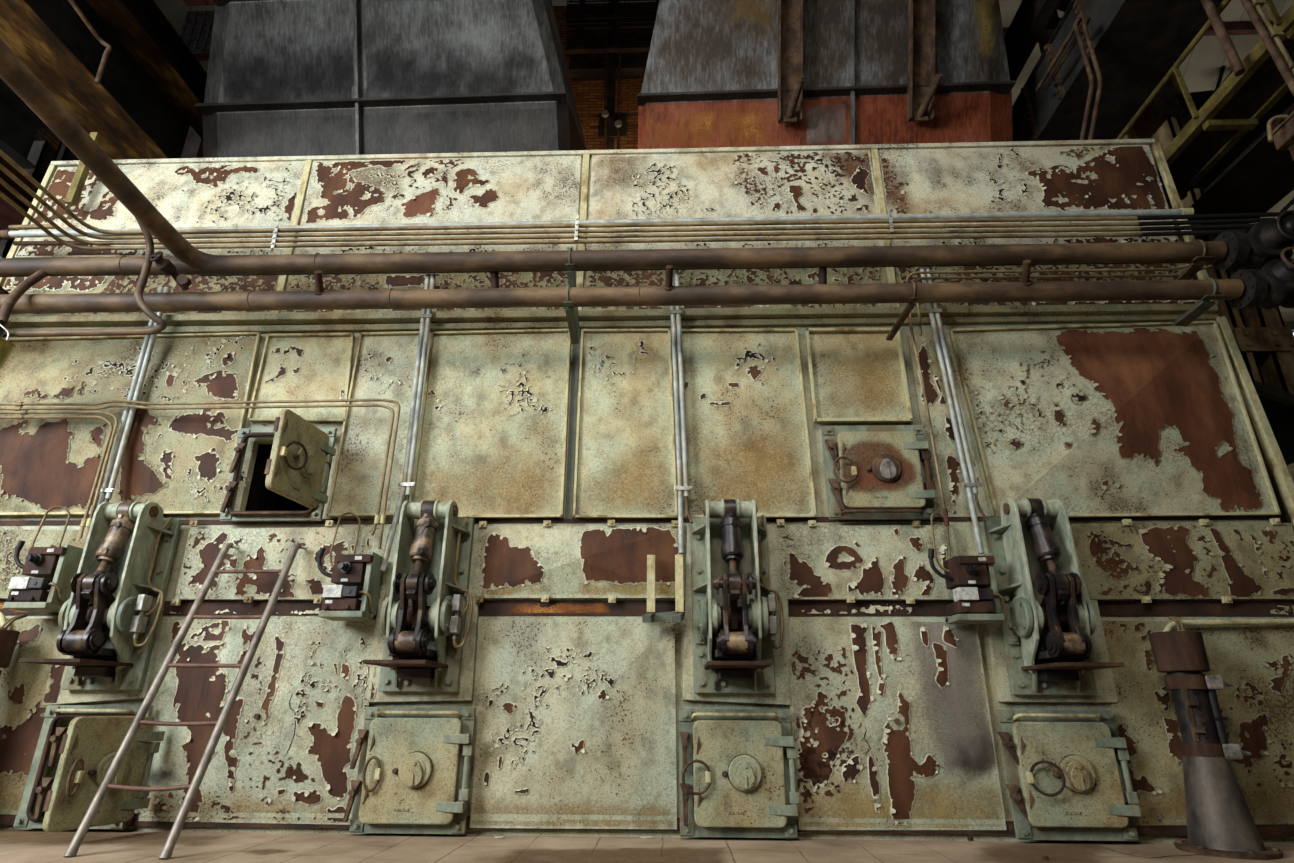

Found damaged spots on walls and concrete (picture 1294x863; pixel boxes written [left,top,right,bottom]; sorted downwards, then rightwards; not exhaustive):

peeling [16,168,146,256]
peeling [284,160,500,224]
peeling [1024,146,1167,211]
peeling [0,351,240,512]
corrosion [843,442,914,492]
peeling [1052,327,1263,512]
peeling [183,532,371,615]
peeling [479,532,545,590]
peeling [578,527,679,585]
peeling [1087,524,1294,615]
peeling [171,610,286,822]
peeling [783,528,948,826]